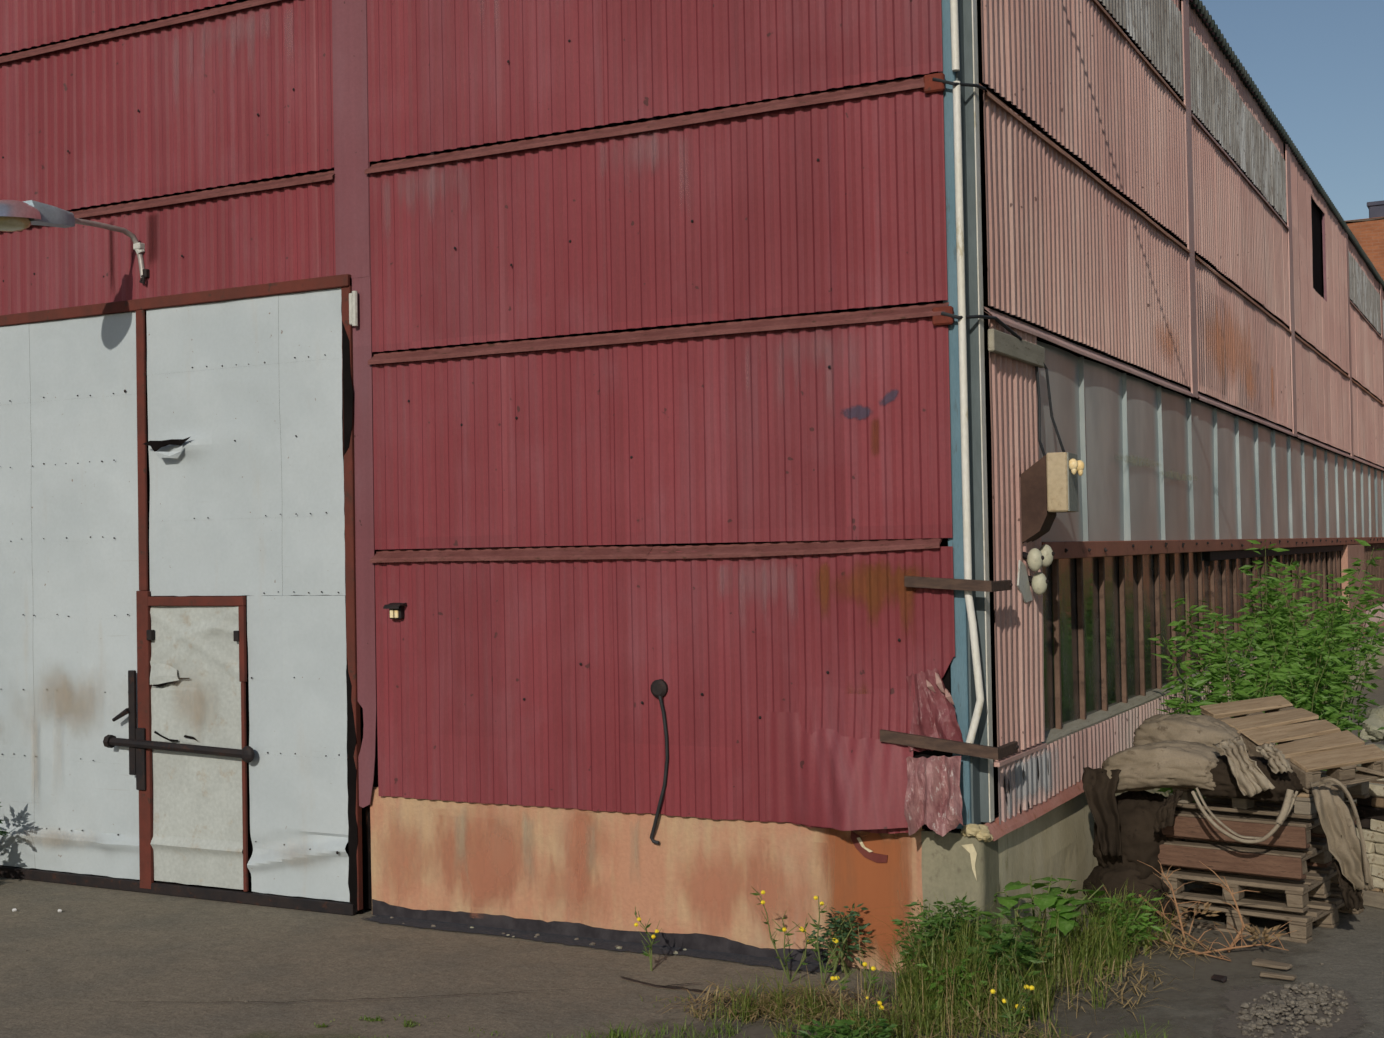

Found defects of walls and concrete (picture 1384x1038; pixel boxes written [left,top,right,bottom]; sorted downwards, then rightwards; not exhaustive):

peeling [926,672,954,705]
rust [829,829,909,964]